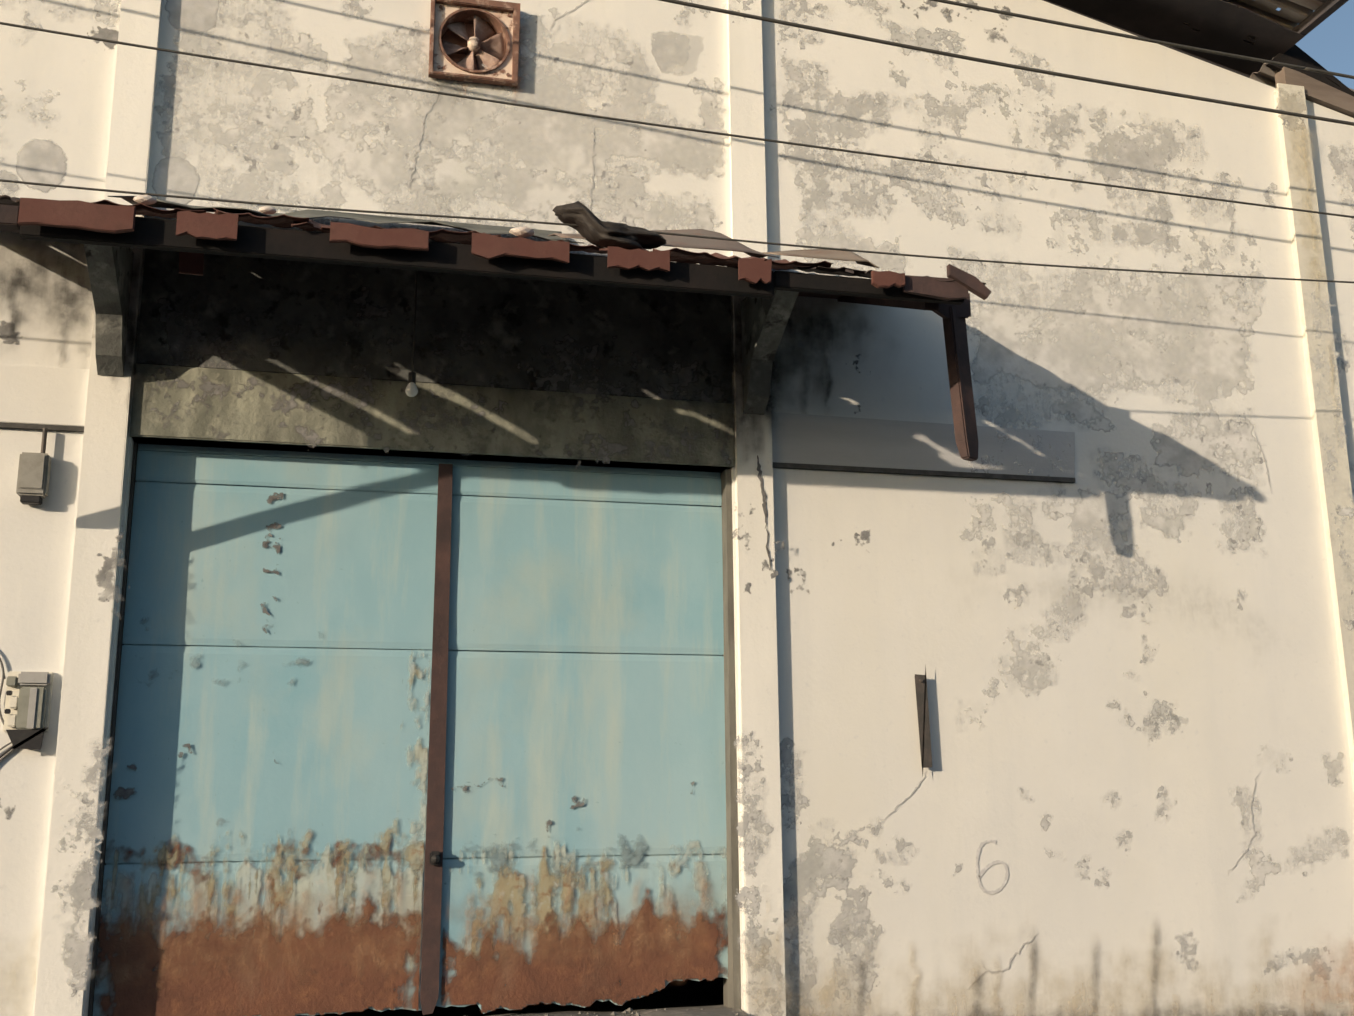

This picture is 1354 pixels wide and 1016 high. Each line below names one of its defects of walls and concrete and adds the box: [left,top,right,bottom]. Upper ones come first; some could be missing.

peeling [156,0,728,246]
peeling [0,321,19,345]
peeling [778,0,1265,697]
crack [757,455,771,570]
peeling [764,541,809,592]
peeling [1107,692,1181,732]
corrosion [95,725,428,1016]
corrosion [441,820,728,1013]
peeling [734,731,909,1016]